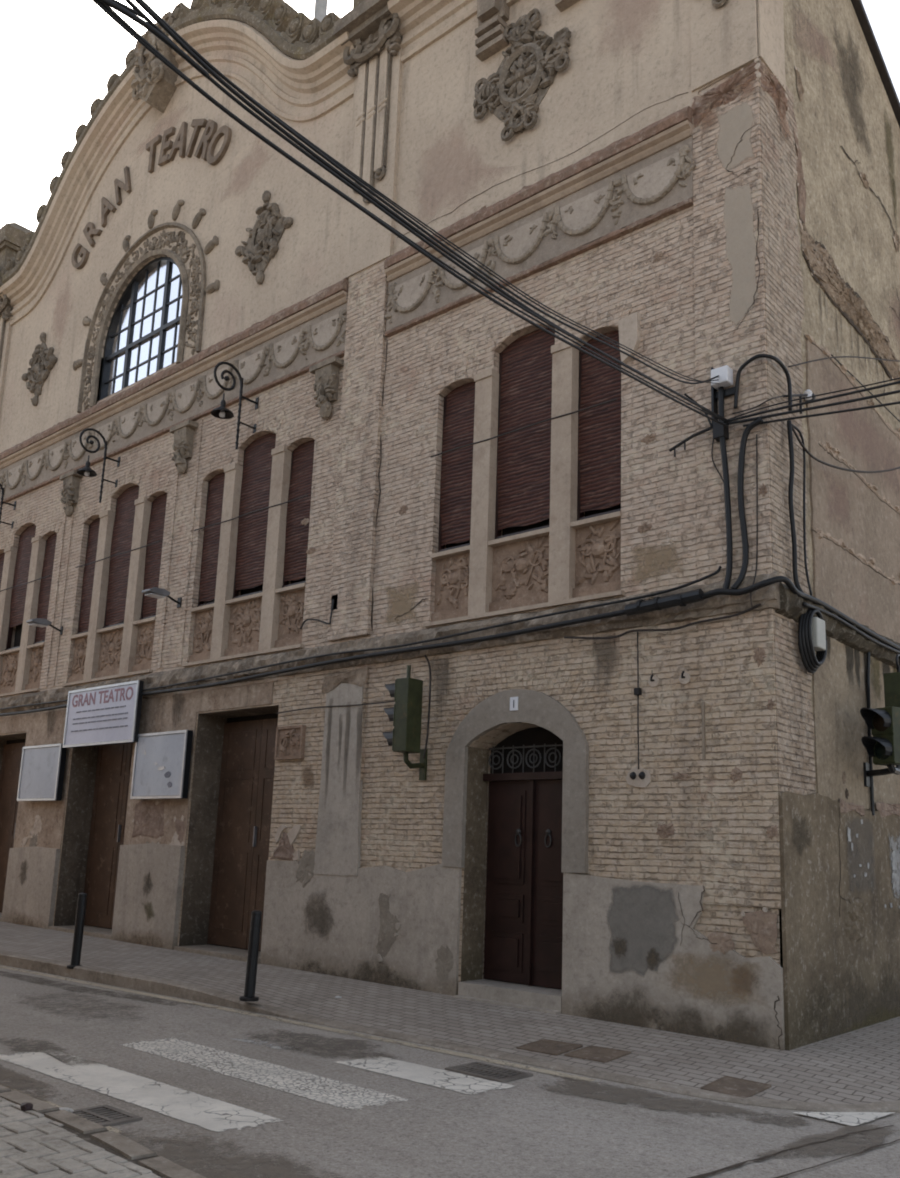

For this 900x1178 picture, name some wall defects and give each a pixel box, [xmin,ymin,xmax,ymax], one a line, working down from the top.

water stain [840,37,867,144]
spalling [691,56,900,385]
crack [841,146,899,252]
flaking render [376,893,401,962]
crack [678,886,717,945]
spalling [740,907,779,954]
water stain [588,1001,767,1047]